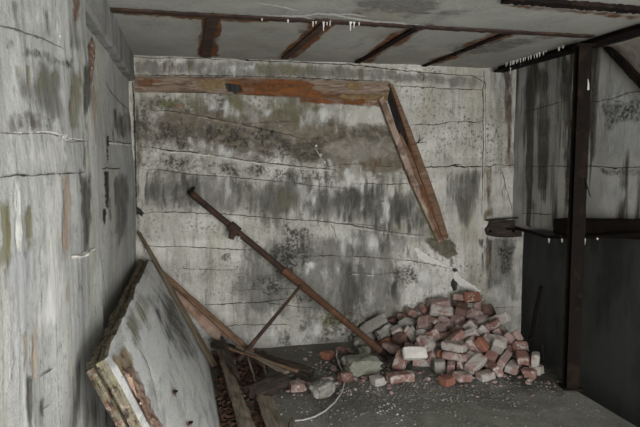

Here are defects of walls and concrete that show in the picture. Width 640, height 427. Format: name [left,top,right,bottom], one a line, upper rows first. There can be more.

crack [0,26,63,49]
corrosion [121,13,269,58]
corrosion [282,19,334,58]
crack [0,130,85,178]
leakage [157,122,290,203]
crack [102,56,549,238]
leakage [71,174,95,259]
leakage [306,158,411,252]
leakage [447,170,480,225]
leakage [7,168,71,424]
crack [154,244,242,252]
flaking render [414,247,481,292]